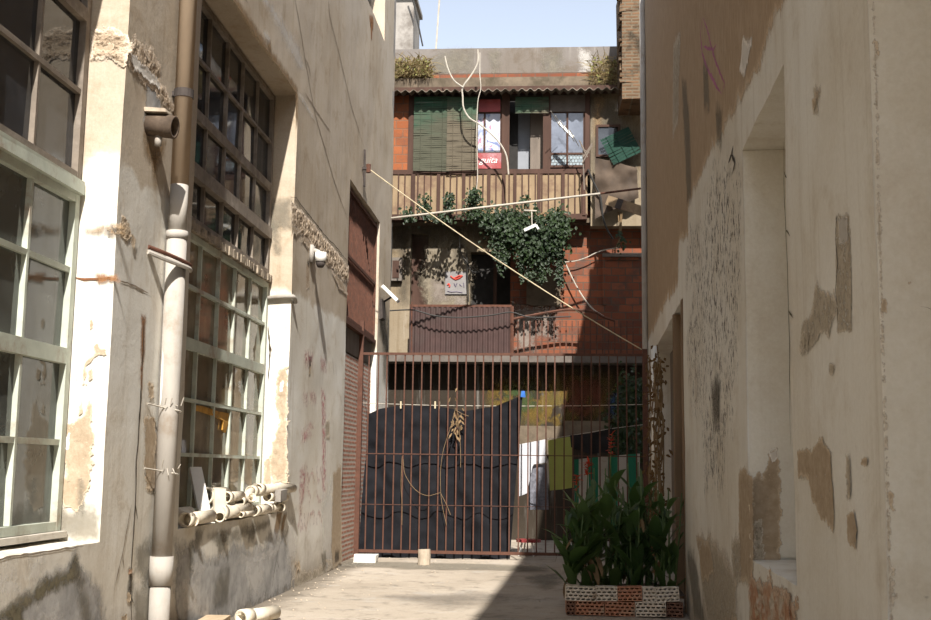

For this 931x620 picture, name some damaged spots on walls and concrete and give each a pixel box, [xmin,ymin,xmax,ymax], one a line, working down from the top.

flaking render [89,26,174,121]
flaking render [812,85,820,114]
peeling [645,0,784,492]
flaking render [799,213,852,354]
flaking render [872,3,888,382]
peeling [62,399,95,512]
peeling [263,366,290,484]
flaking render [688,448,799,620]
peeling [797,436,834,532]
peeling [846,511,857,549]